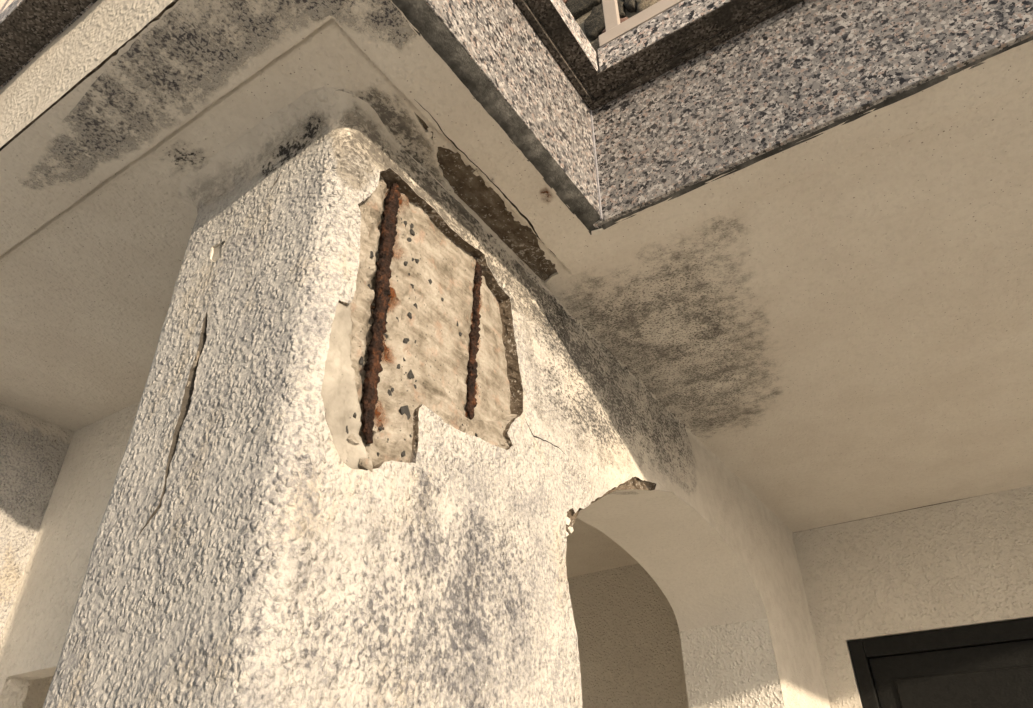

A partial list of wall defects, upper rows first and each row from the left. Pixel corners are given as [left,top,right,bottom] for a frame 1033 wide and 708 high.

damp [163,144,205,167]
damp [262,116,321,176]
corrosion [381,334,393,362]
corrosion [387,287,399,311]
spalling [321,168,523,472]
damp [330,89,778,488]
crack [134,312,207,543]